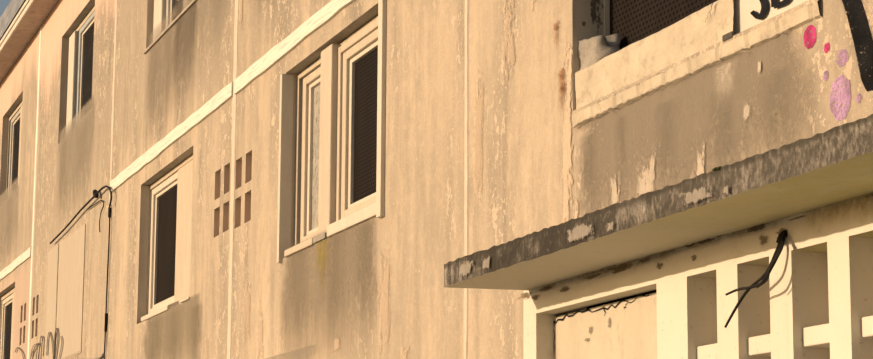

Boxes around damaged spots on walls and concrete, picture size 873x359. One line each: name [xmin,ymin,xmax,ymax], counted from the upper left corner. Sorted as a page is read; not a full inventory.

peeling [610,173,620,204]
peeling [633,155,655,196]
peeling [696,145,705,176]
leakage [283,219,373,327]
leakage [145,296,198,359]
crack [553,295,649,339]